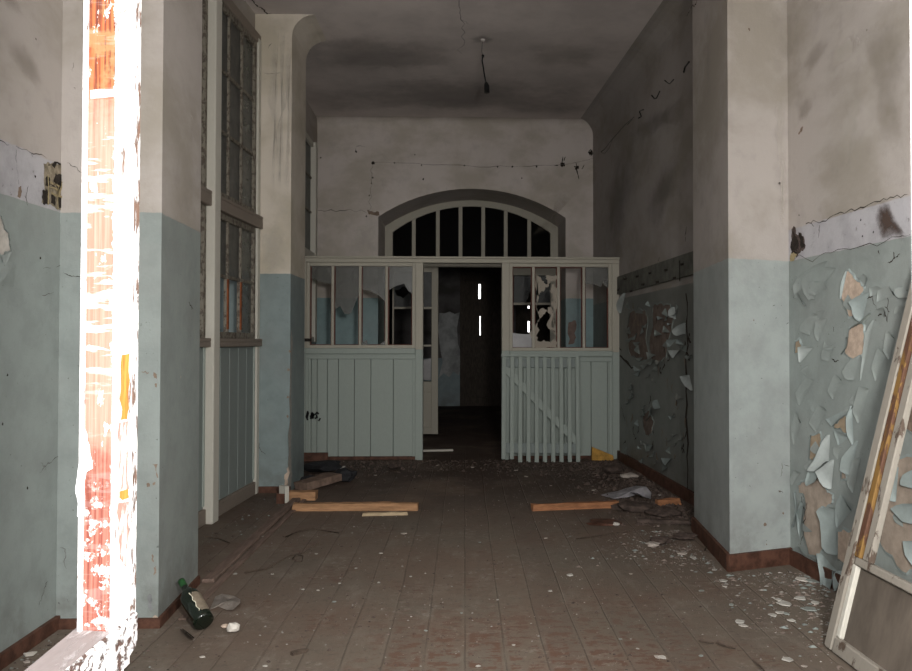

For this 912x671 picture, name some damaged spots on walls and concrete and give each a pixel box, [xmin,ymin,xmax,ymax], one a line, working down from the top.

flaking render [35,161,62,210]
flaking render [790,226,806,261]
peeling [616,293,693,390]
peeling [790,261,912,591]